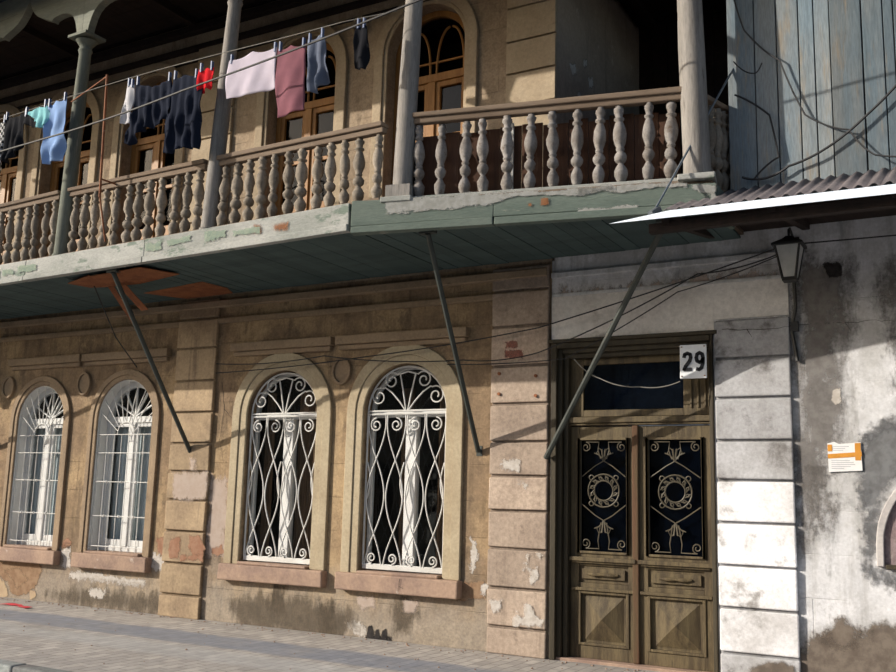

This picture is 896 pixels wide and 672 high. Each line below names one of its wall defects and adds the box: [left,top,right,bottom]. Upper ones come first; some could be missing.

peeling [385,181,717,214]
leakage [876,259,896,346]
peeling [500,459,528,489]
leakage [856,419,896,585]
peeling [469,536,479,574]
peeling [522,553,543,584]
leakage [231,585,351,635]
leakage [365,598,419,641]
peeling [480,584,502,613]
peeling [512,603,545,628]
leakage [750,616,896,672]